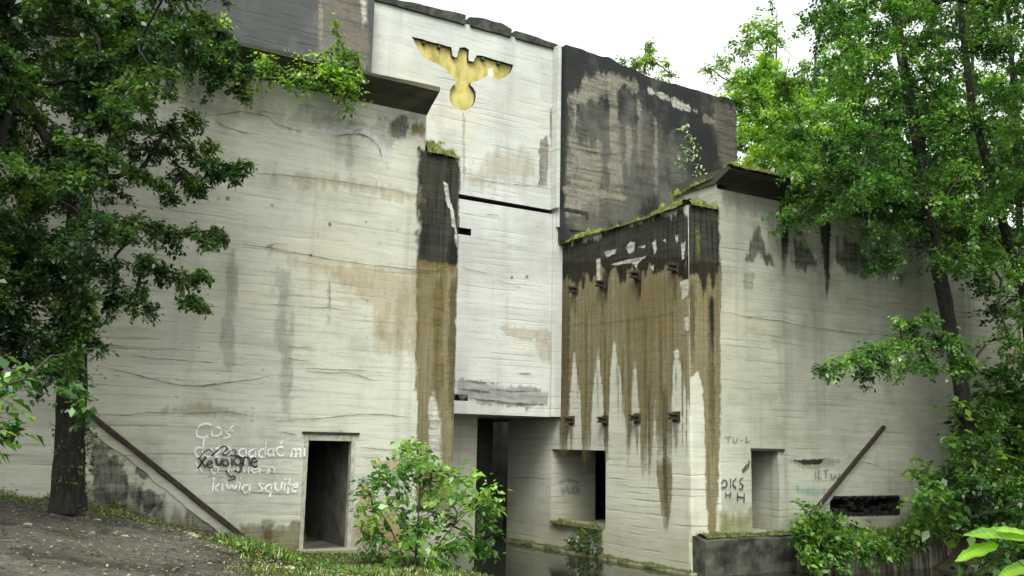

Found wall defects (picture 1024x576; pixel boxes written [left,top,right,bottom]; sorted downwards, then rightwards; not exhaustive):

crack [206,111,297,135]
leakage [563,73,689,217]
leakage [413,125,461,512]
leakage [559,202,722,534]
leakage [745,197,789,265]
leakage [819,207,832,293]